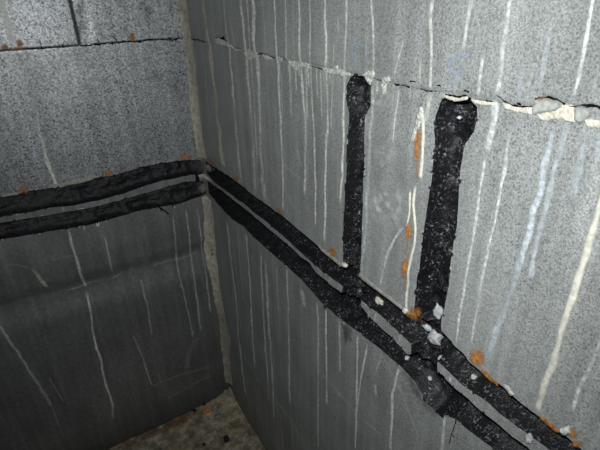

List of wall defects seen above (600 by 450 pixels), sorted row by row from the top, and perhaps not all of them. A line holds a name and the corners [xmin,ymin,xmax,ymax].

damp [35,110,57,184]
crack [29,33,239,50]
damp [240,0,266,198]
damp [273,0,332,239]
damp [484,101,499,150]
crack [395,81,600,109]
damp [496,0,511,92]
damp [456,161,485,342]
damp [86,295,114,407]
damp [260,256,275,417]
damp [316,306,328,446]
rust [470,351,498,385]